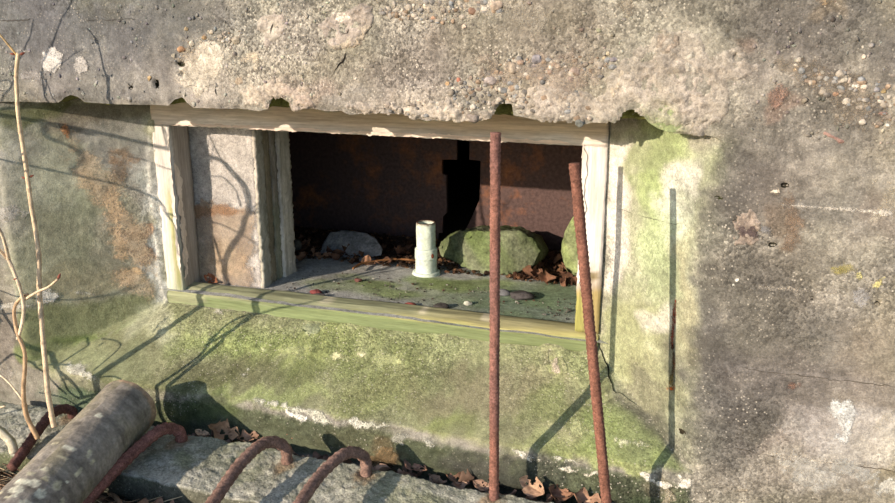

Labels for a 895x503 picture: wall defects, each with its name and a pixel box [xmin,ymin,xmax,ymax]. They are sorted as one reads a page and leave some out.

spalling [171,27,248,98]
spalling [235,76,317,111]
spalling [346,51,630,128]
peeling [167,137,189,281]
damp [0,289,59,310]
spalling [173,122,570,503]
spalling [569,144,612,503]
damp [67,363,95,380]
damp [378,354,400,367]
crack [599,346,638,406]
damp [254,398,331,424]
damp [349,418,385,429]